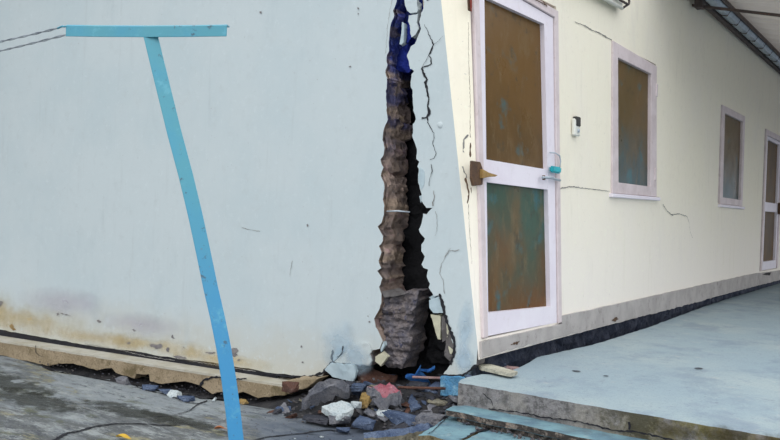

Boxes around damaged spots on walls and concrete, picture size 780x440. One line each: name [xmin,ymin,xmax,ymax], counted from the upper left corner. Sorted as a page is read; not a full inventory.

crack [376,0,477,383]
crack [0,330,326,386]
crack [461,393,673,440]